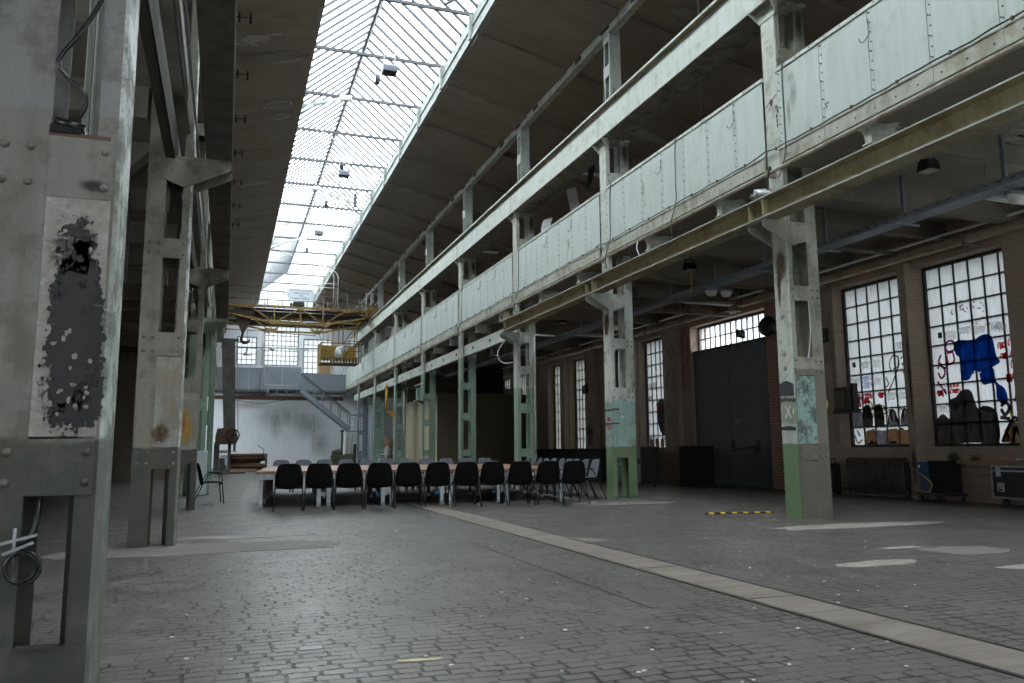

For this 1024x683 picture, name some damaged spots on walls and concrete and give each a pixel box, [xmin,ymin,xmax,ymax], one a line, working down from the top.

peeling [35,202,107,450]
rust [153,426,168,442]